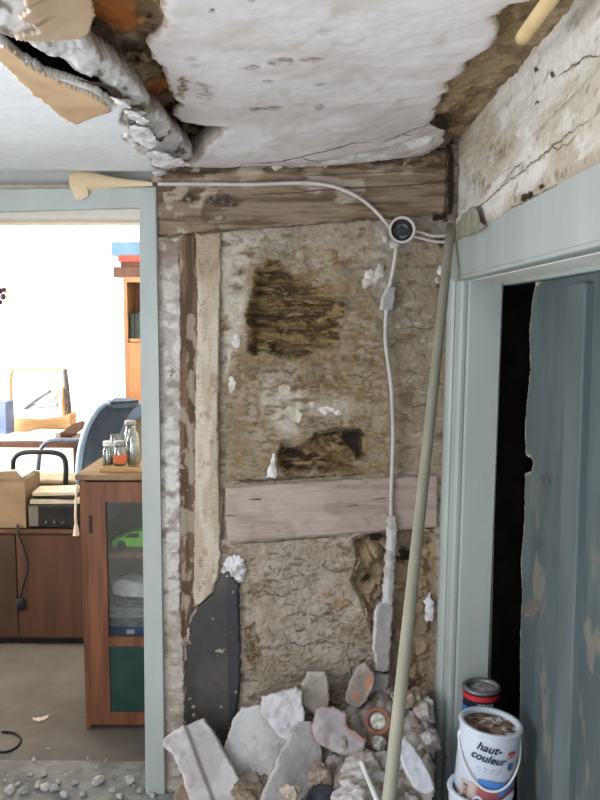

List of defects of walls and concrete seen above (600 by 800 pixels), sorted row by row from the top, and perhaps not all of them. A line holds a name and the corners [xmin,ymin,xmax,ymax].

spalling [90,0,207,138]
peeling [109,96,191,177]
crack [205,122,442,232]
spalling [429,0,574,238]
crack [464,122,585,211]
crack [558,55,599,77]
spalling [227,258,349,361]
spalling [266,426,368,479]
crack [251,560,354,679]
spalling [351,531,386,629]
spalling [390,530,412,687]
spalling [408,528,439,692]